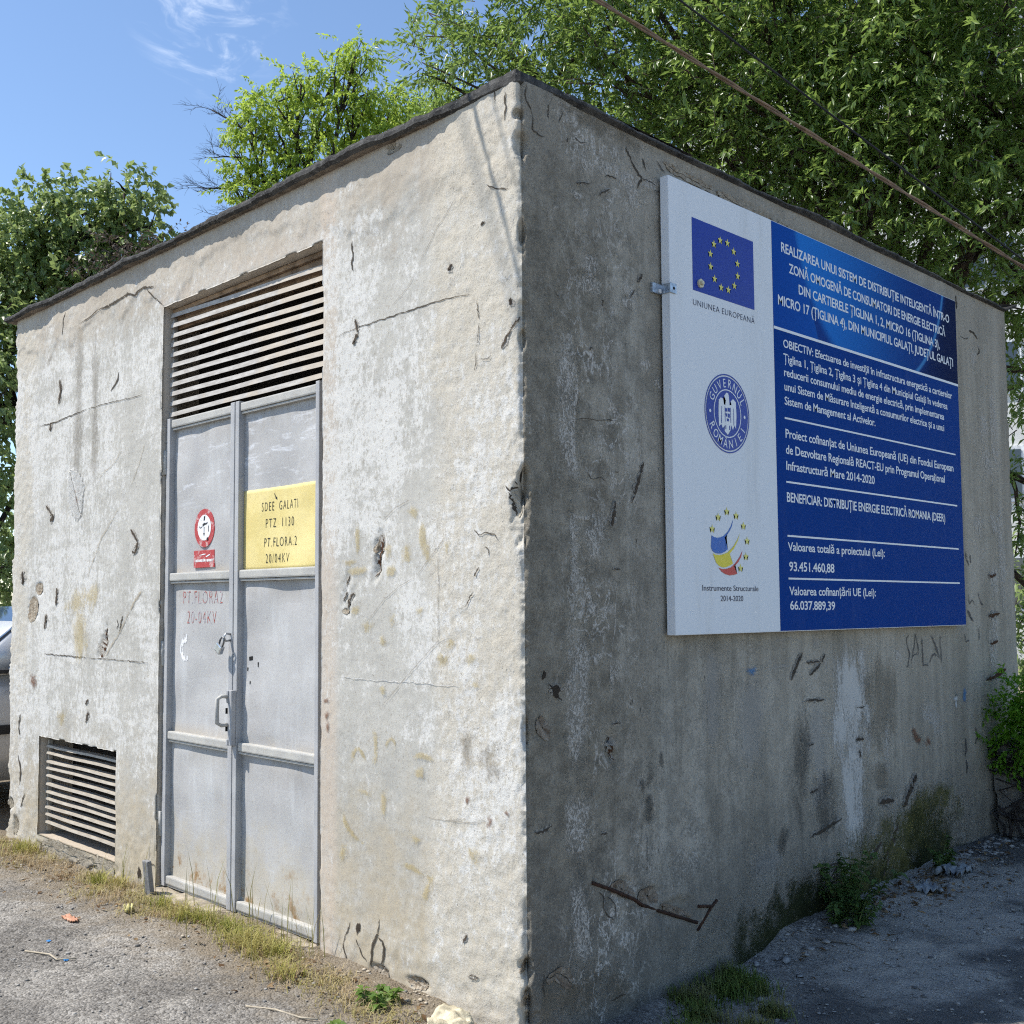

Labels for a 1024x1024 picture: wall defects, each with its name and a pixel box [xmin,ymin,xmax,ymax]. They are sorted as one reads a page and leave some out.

crack [340,197,491,370]
crack [62,286,162,332]
crack [44,373,139,425]
spalling [506,469,523,518]
hole [342,575,355,614]
hole [373,534,385,577]
crack [368,541,442,620]
crack [45,653,145,663]
water stain [722,646,956,967]
rust [591,881,718,931]